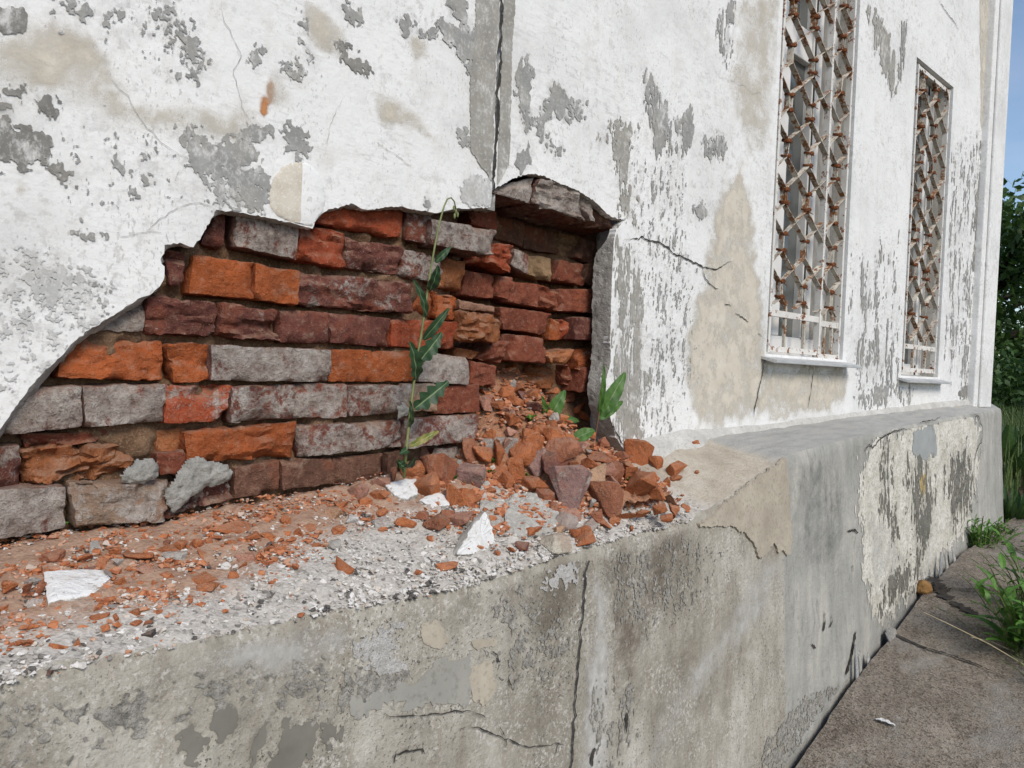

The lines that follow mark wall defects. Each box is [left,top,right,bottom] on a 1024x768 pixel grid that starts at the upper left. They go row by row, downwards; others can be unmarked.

crack [492,0,504,189]
peeling [0,0,793,706]
crack [630,236,761,335]
leakage [687,175,846,426]
peeling [944,140,981,399]
peeling [855,417,982,637]
crack [384,560,595,768]